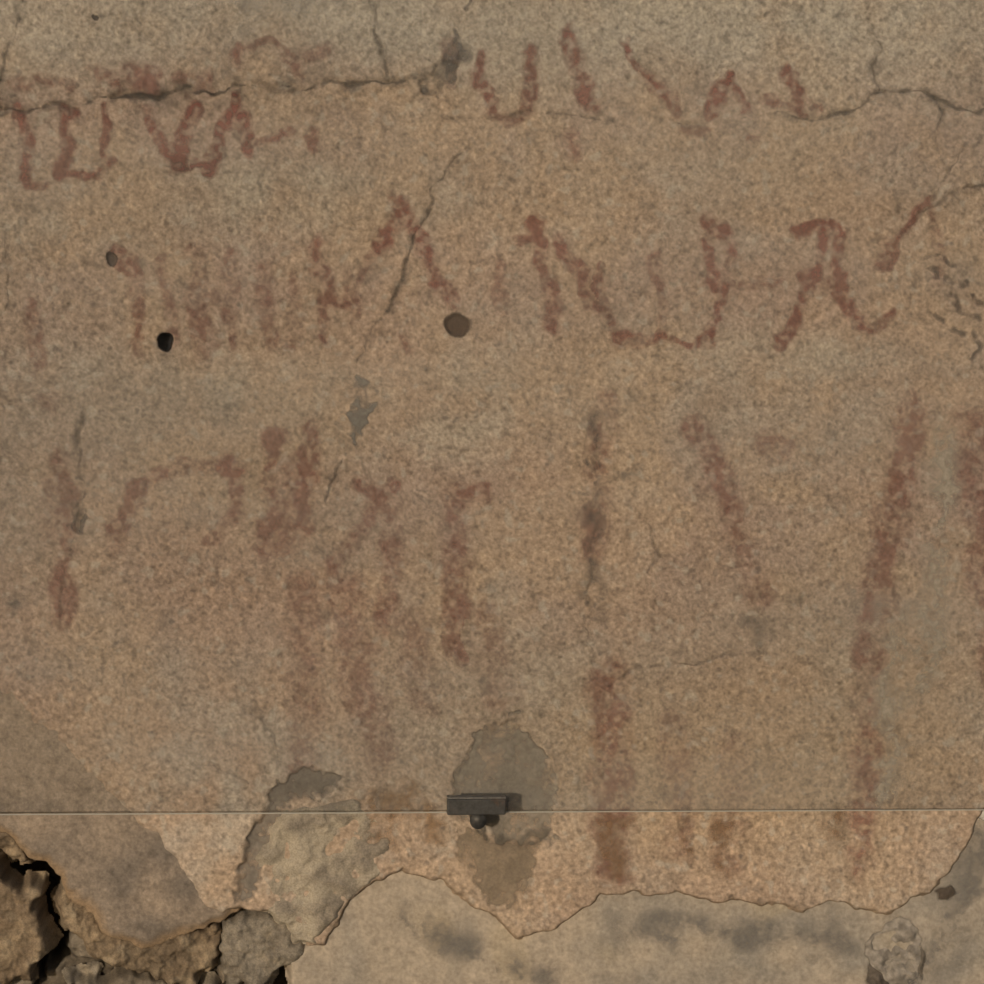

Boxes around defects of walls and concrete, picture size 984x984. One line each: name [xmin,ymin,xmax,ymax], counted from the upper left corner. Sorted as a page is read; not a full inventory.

crack [111,84,244,101]
crack [287,80,405,89]
crack [874,91,984,114]
crack [792,109,856,120]
crack [387,209,430,312]
spalling [235,767,341,901]
peeling [936,886,955,899]
peeling [865,917,926,984]